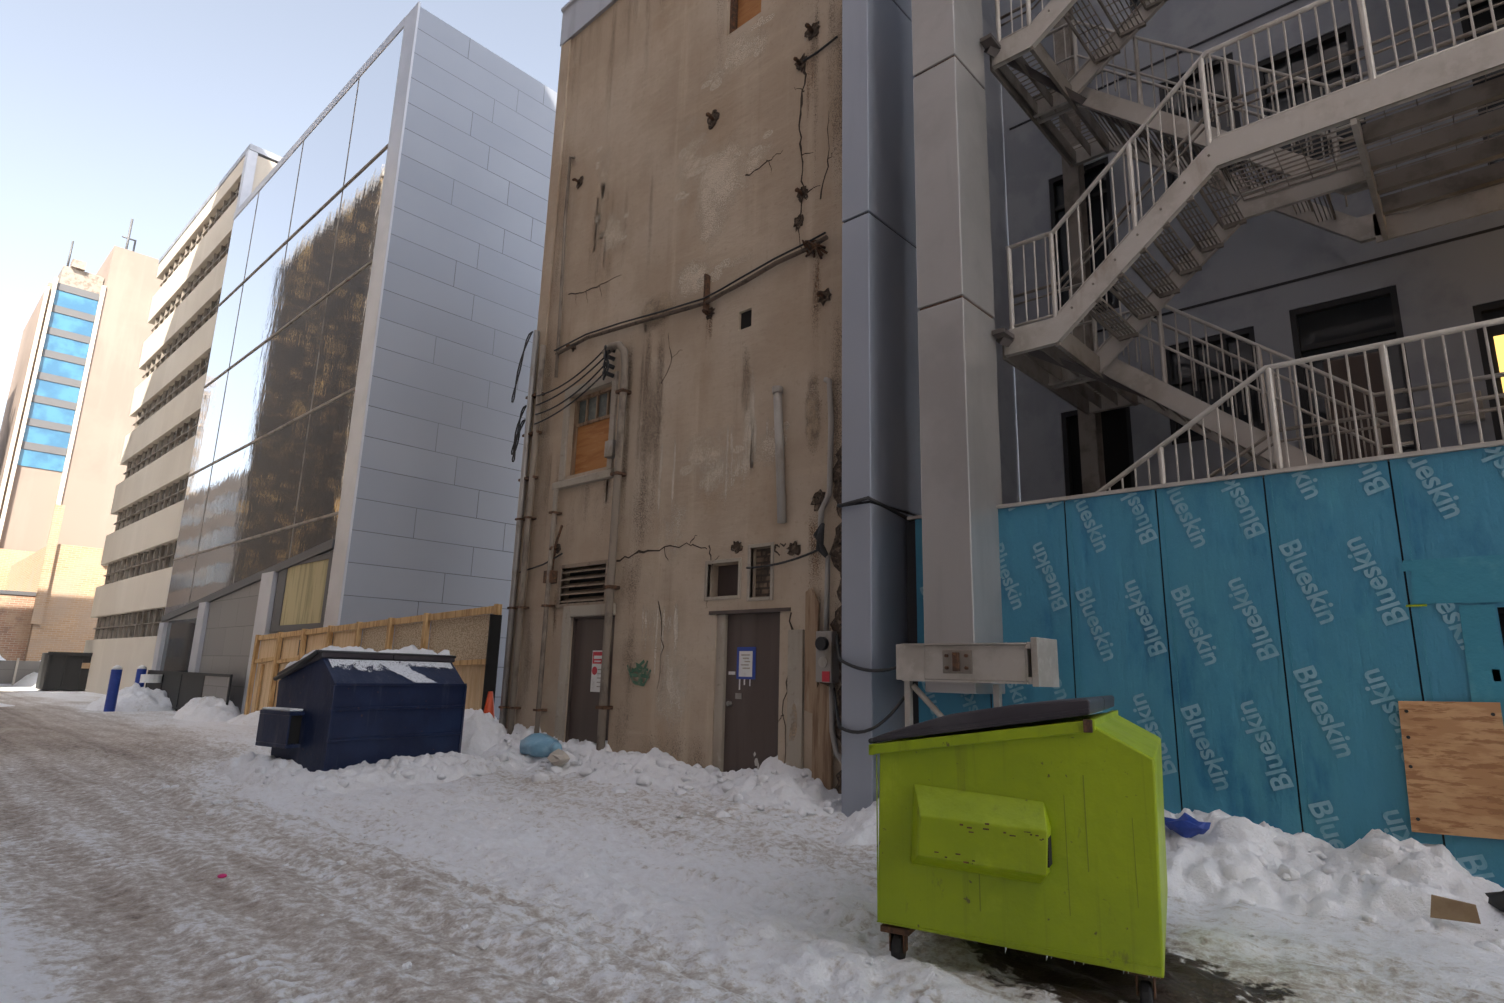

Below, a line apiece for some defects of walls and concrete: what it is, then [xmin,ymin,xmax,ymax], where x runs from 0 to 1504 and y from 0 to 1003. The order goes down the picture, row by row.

crack [745,56,835,249]
leakage [533,324,769,767]
crack [656,601,664,688]
crack [616,535,719,606]